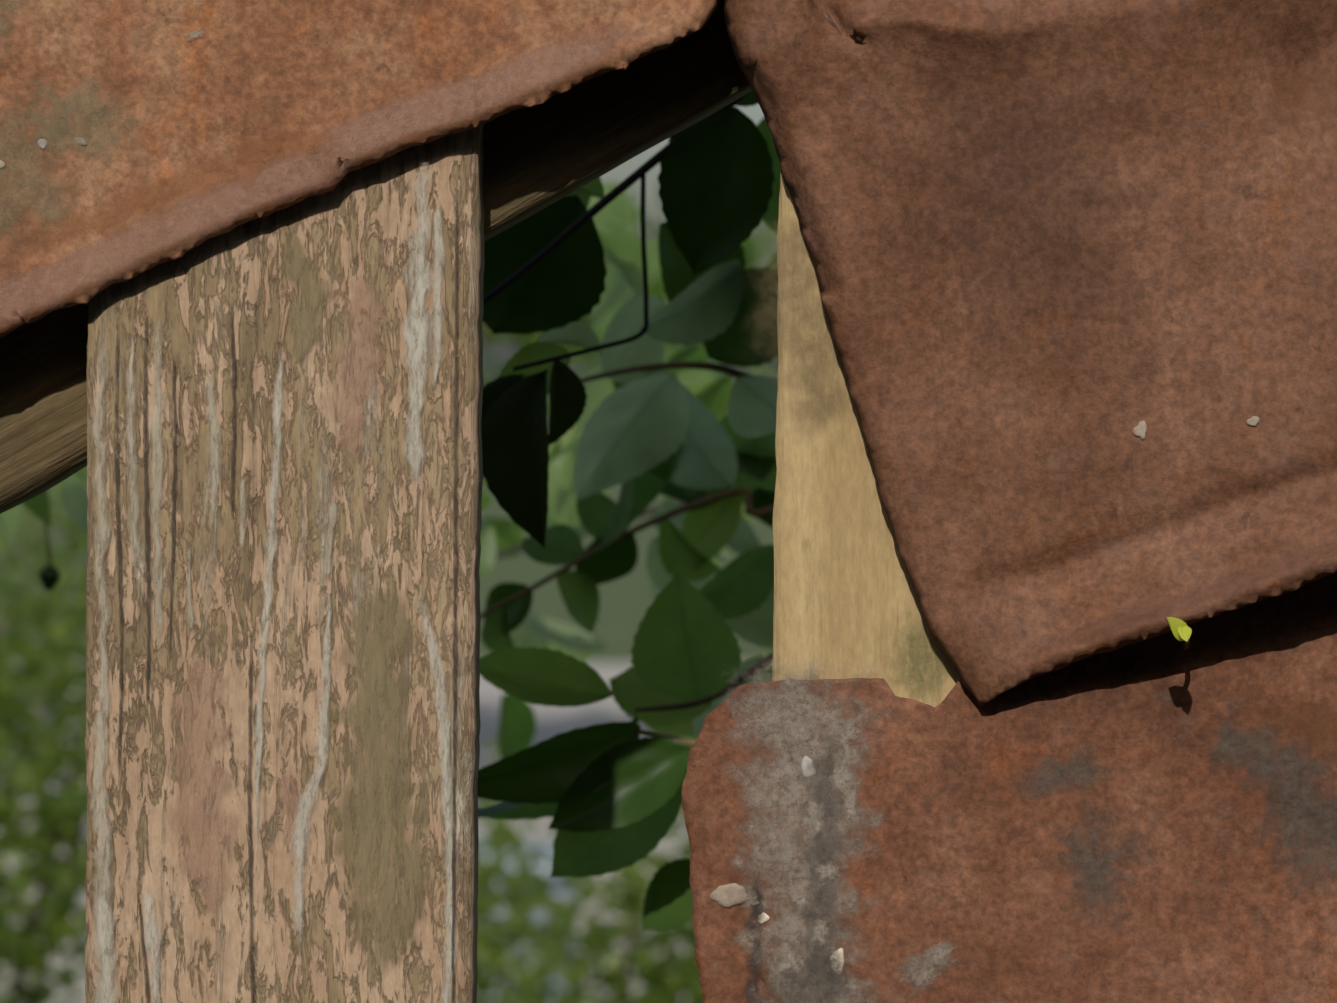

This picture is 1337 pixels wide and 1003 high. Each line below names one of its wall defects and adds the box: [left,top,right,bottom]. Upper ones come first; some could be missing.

leakage [746,886,761,1002]